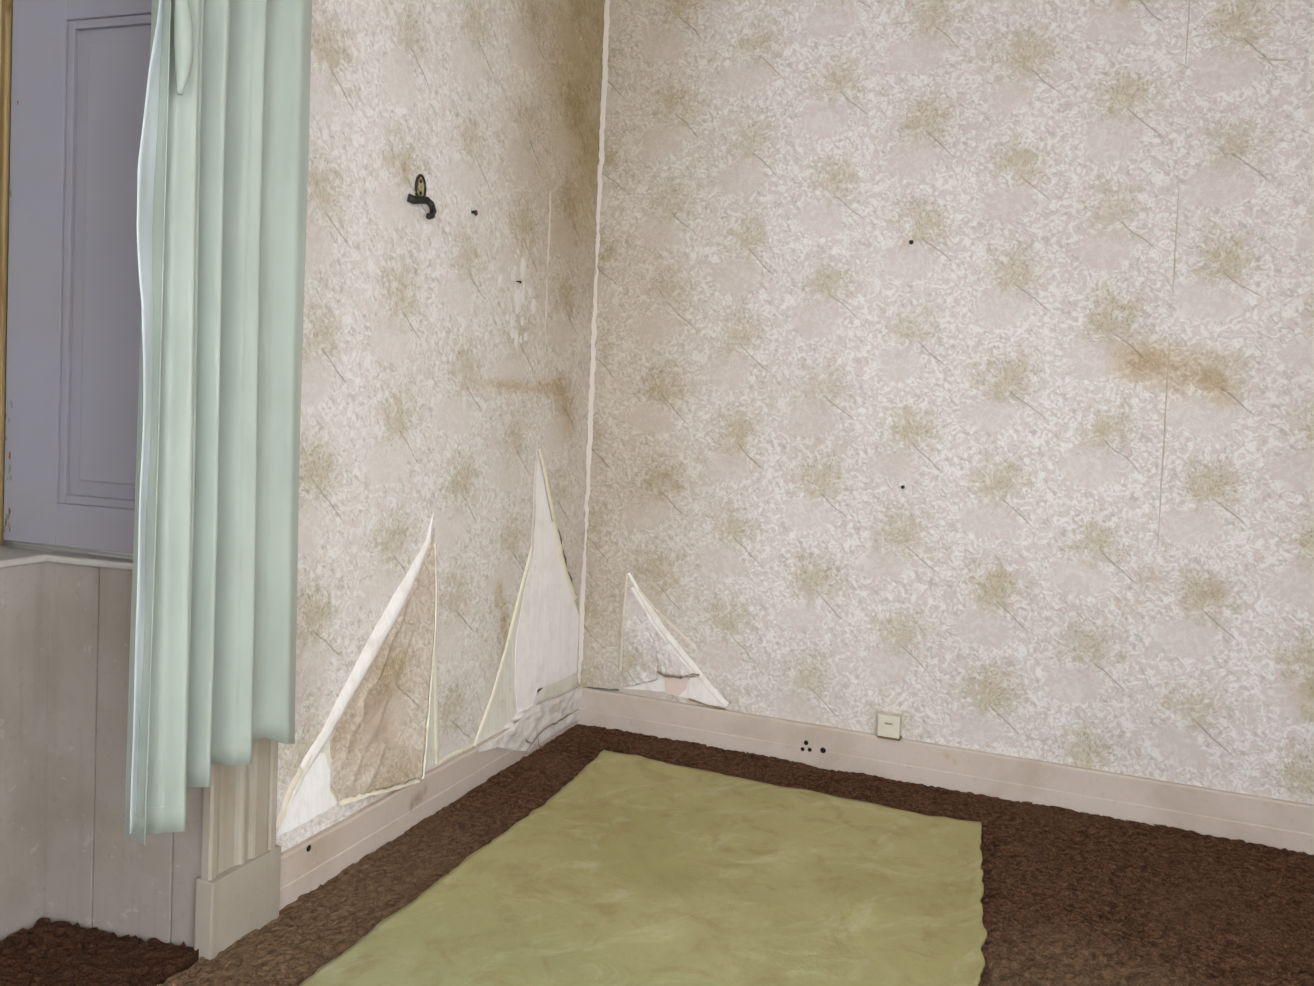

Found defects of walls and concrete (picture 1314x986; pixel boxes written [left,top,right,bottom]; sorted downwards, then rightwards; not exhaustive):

flaking render [477,561,582,752]
flaking render [621,670,691,699]
flaking render [277,724,339,836]